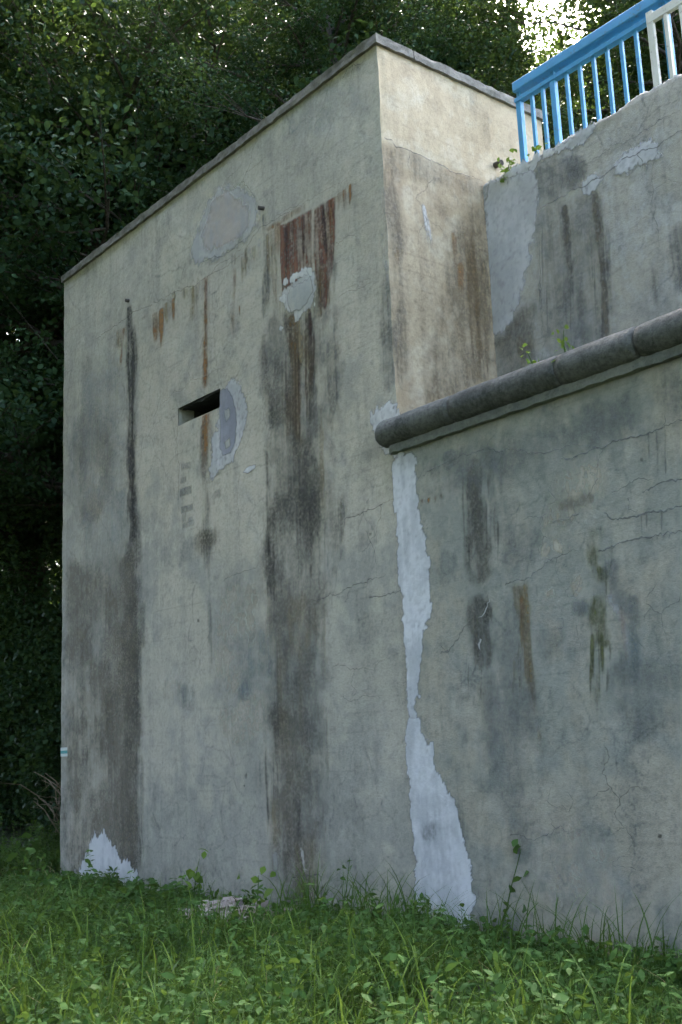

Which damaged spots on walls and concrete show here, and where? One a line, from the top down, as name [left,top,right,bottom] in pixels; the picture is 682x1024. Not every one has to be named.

rust [153,294,175,343]
rust [191,280,207,386]
peeling [279,267,312,303]
rust [266,184,352,436]
leakage [562,205,573,291]
leakage [593,195,609,336]
leakage [466,464,516,581]
crack [424,415,682,585]
leakage [64,308,140,873]
leakage [468,598,491,667]
rust [519,585,534,699]
crack [510,747,642,879]